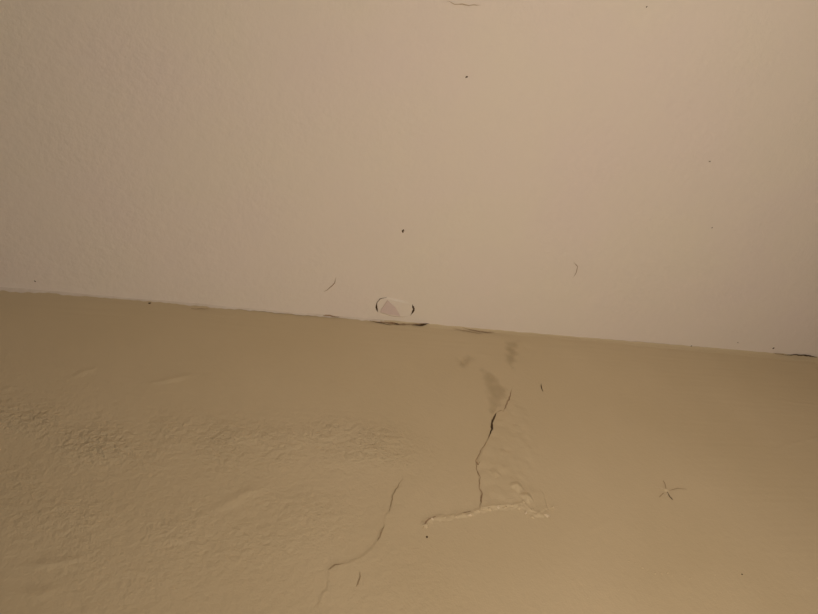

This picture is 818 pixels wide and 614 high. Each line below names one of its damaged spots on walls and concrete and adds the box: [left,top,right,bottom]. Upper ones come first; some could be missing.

crack [475,389,512,504]